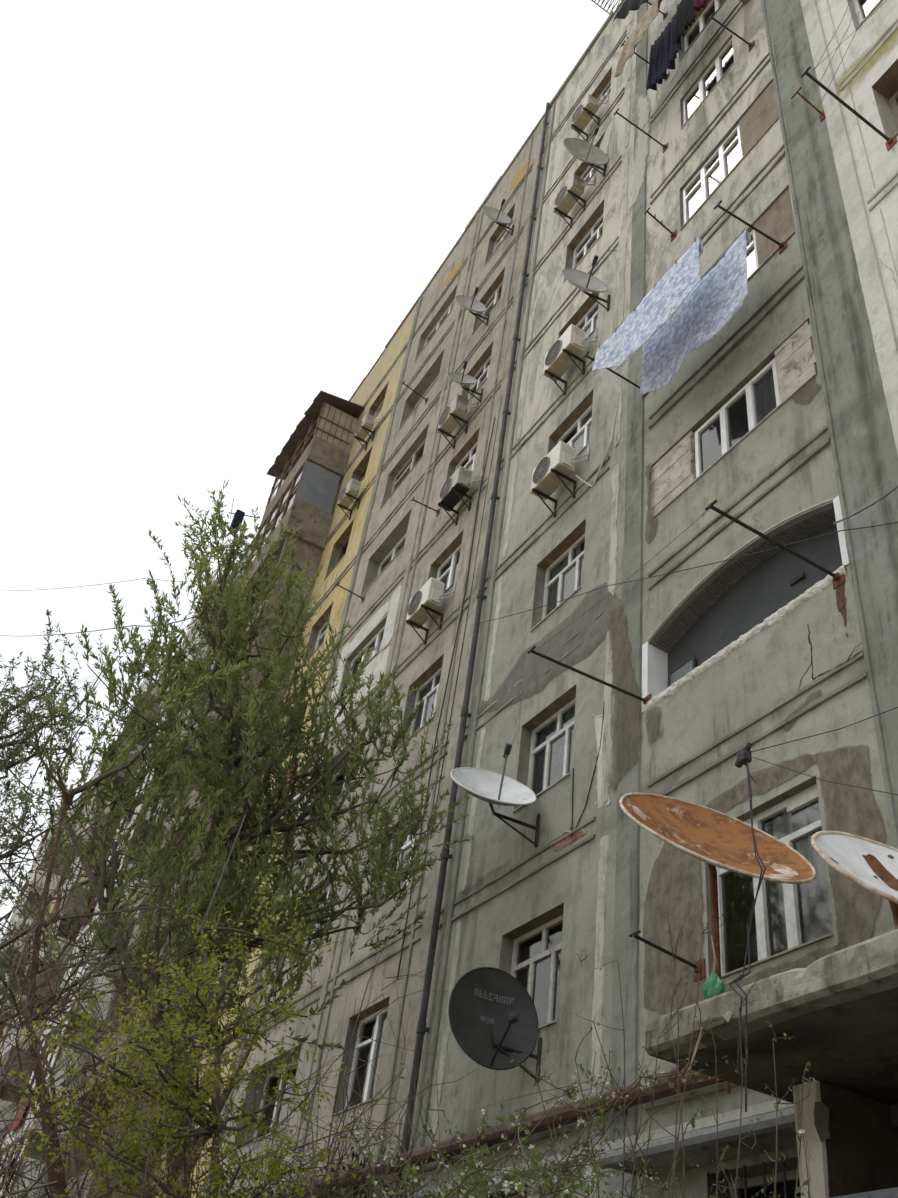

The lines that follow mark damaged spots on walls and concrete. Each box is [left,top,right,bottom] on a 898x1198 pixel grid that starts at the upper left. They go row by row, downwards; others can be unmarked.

corrosion [836,574,848,637]
crack [798,624,863,690]